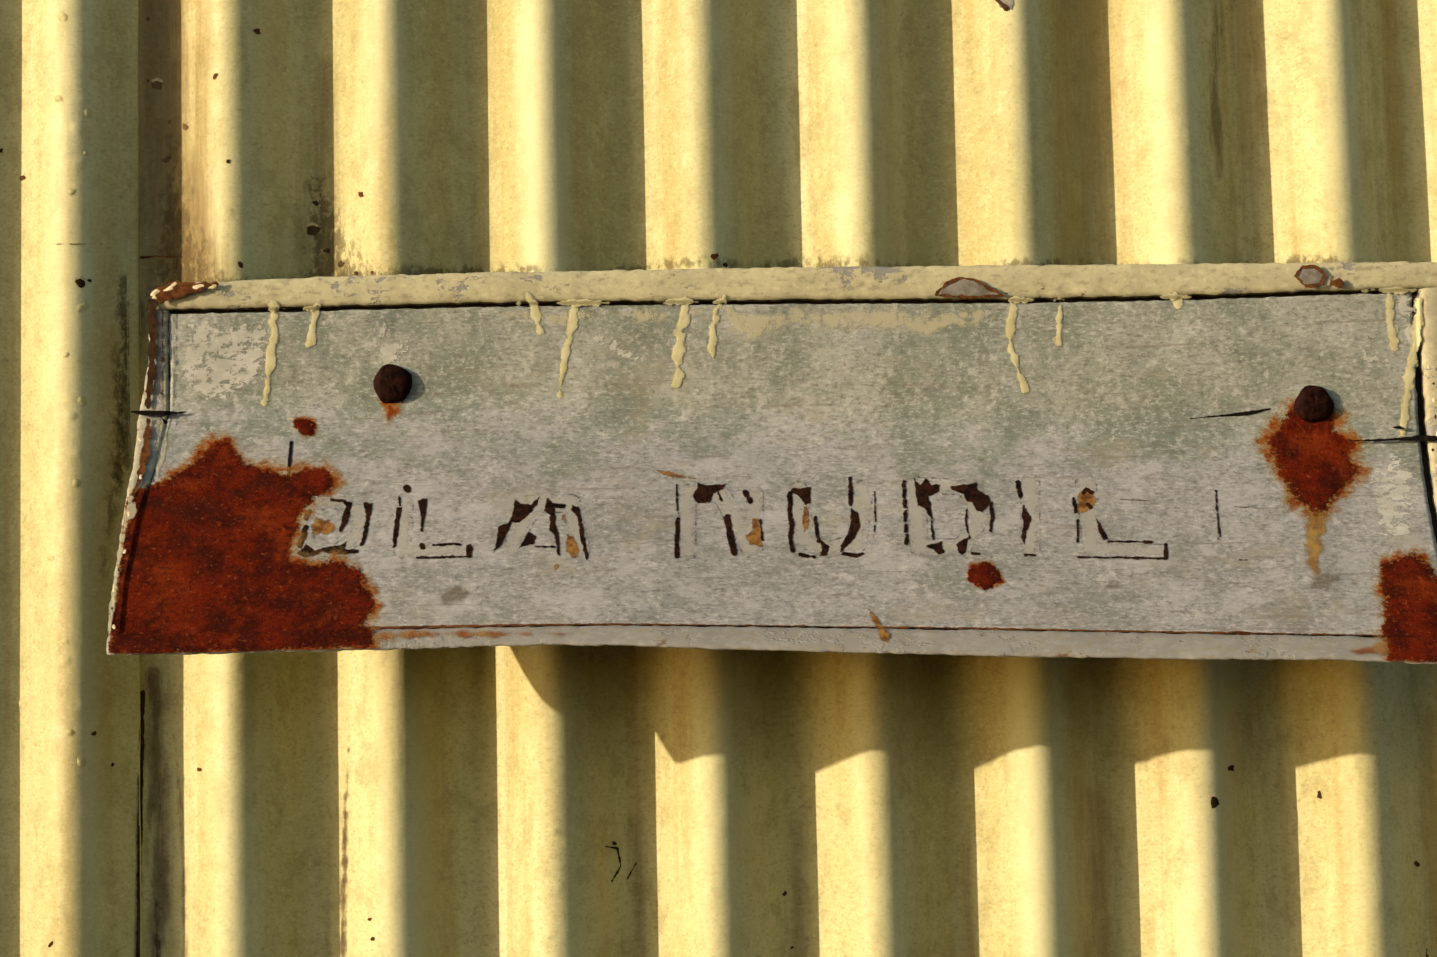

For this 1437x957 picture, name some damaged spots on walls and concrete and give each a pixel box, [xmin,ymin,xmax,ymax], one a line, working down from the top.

peeling [995,0,1014,11]
rust [108,434,436,654]
rust [455,630,505,638]
rust [967,561,1005,590]
rust [1255,400,1372,574]
rust [1354,549,1437,663]
rust [136,673,166,957]
rust [339,794,347,957]